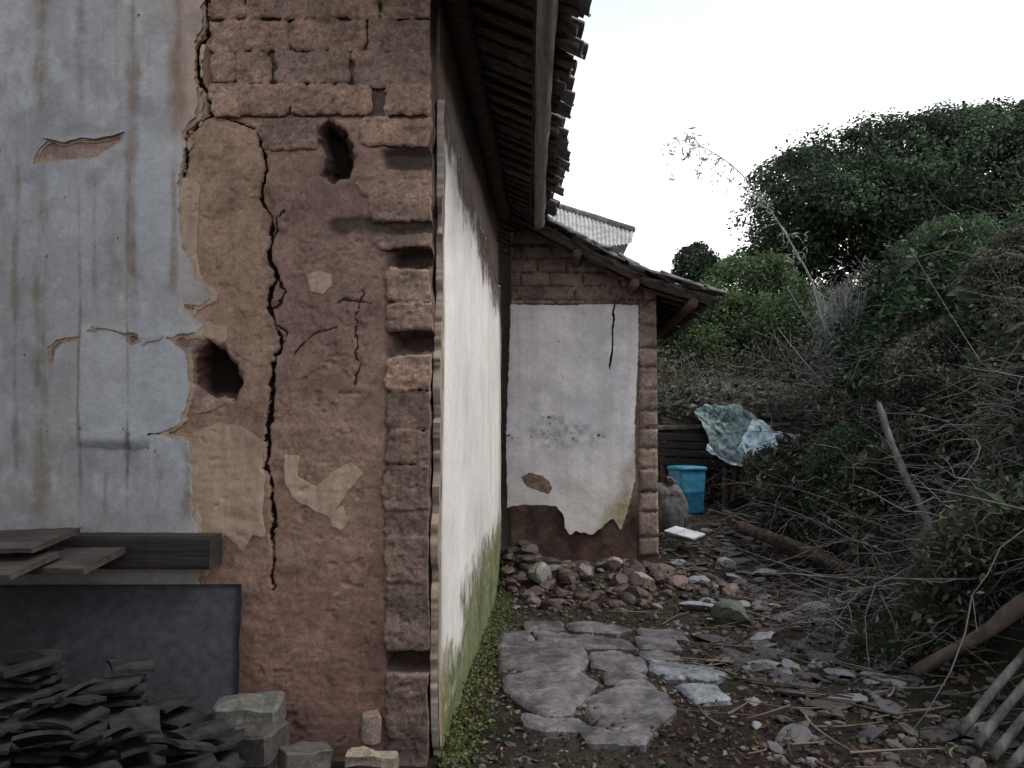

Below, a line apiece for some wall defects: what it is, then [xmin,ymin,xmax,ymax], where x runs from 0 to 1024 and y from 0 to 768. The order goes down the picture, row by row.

flaking render [40,130,124,161]
crack [183,0,372,591]
crack [608,303,616,370]
flaking render [170,121,435,754]
flaking render [511,472,638,562]